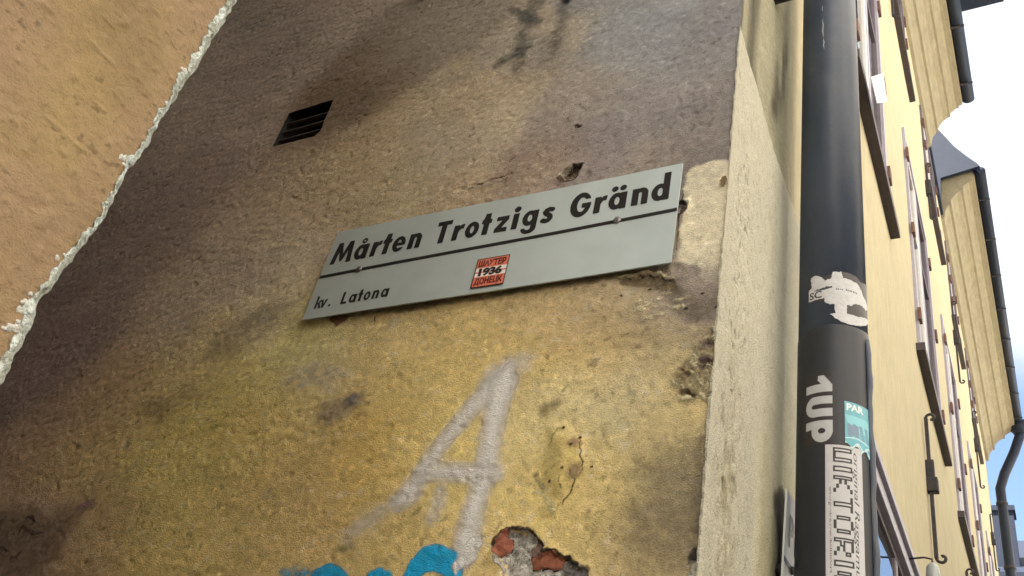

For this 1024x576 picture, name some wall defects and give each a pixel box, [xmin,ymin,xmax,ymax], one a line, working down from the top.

flaking render [619,270,688,319]
spalling [671,325,716,406]
spalling [491,526,588,576]